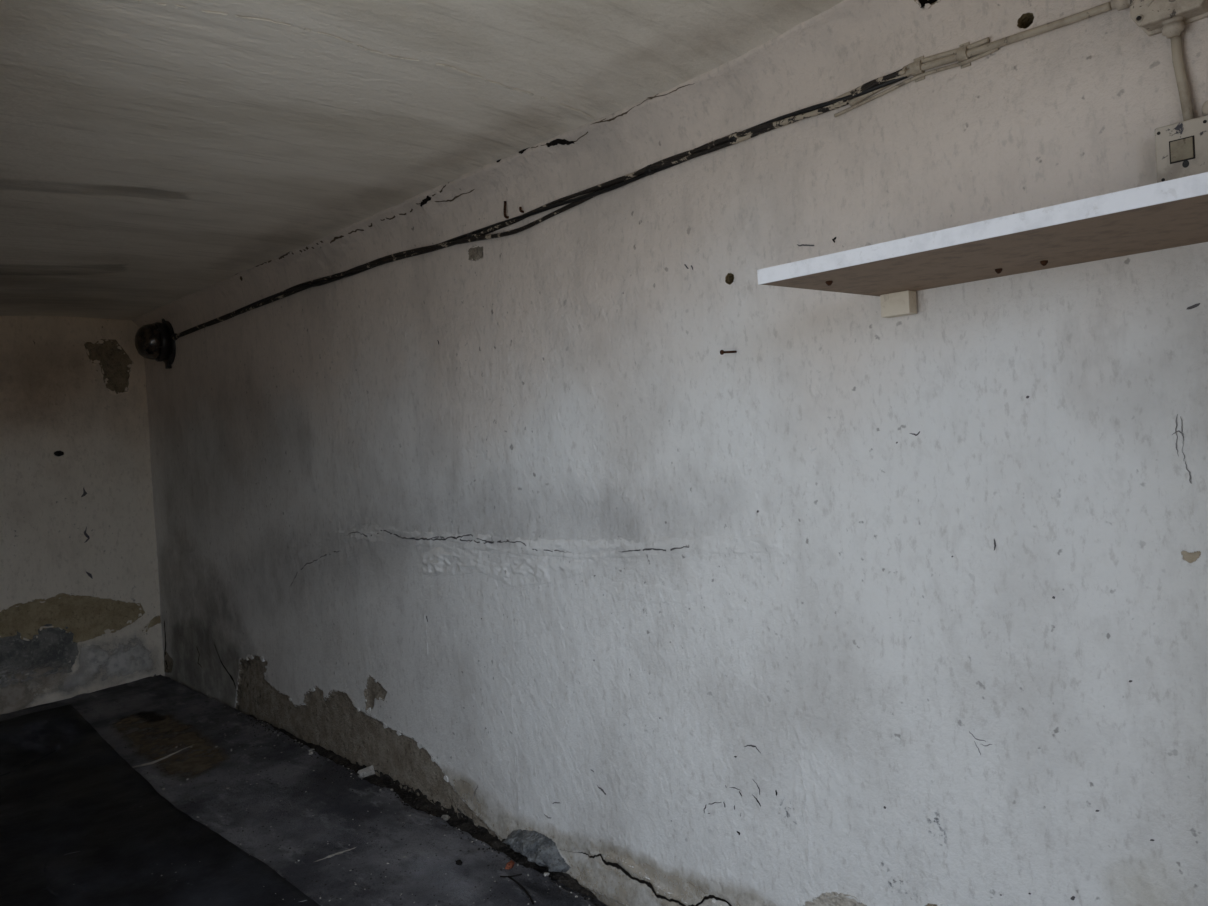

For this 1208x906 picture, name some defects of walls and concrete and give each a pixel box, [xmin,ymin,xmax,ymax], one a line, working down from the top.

flaking render [914,0,941,9]
crack [497,83,695,162]
crack [235,182,474,281]
flaking render [84,339,132,394]
flaking render [0,593,161,714]
flaking render [235,655,571,873]
crack [560,849,732,906]
peeling [805,892,867,906]